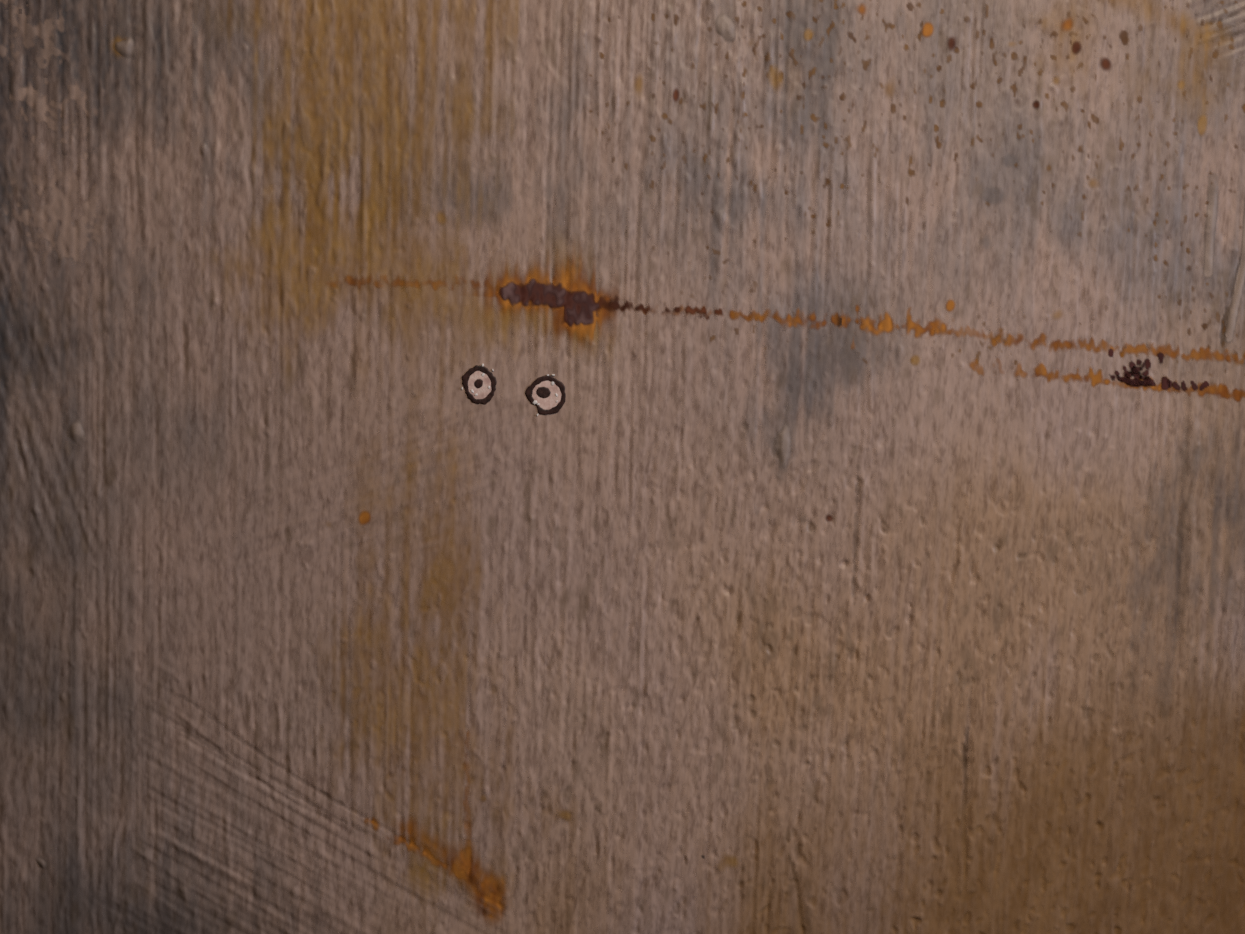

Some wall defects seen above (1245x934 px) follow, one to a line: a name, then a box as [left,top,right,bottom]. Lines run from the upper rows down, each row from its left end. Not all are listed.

corrosion [473,266,650,339]
corrosion [666,306,892,334]
corrosion [908,300,955,337]
corrosion [1015,341,1243,400]
corrosion [395,822,504,919]